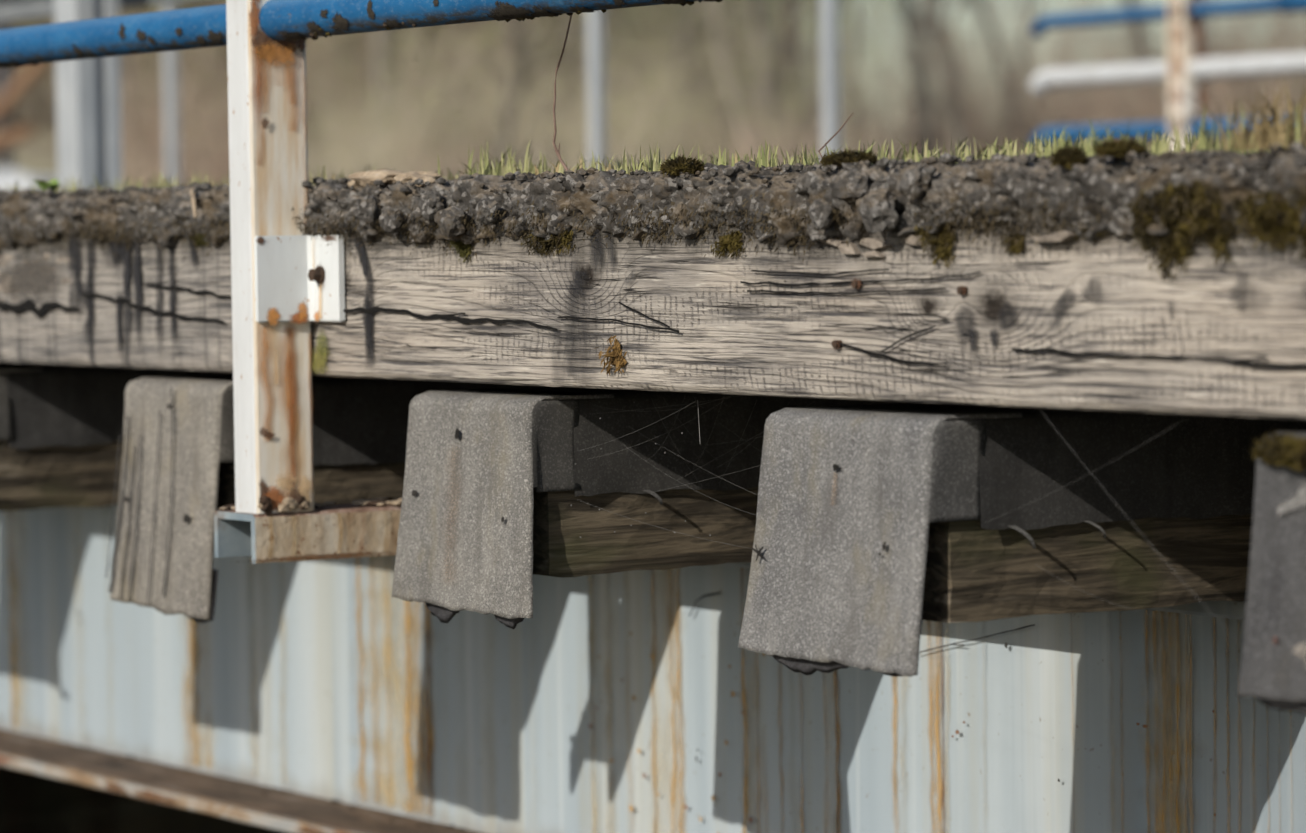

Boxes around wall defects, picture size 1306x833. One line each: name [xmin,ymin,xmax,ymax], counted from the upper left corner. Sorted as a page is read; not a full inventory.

corrosion [249,0,306,129]
crack [0,283,230,324]
damp [68,235,176,349]
crack [343,302,679,333]
corrosion [259,284,321,509]
corrosion [382,601,433,807]
corrosion [930,664,944,822]